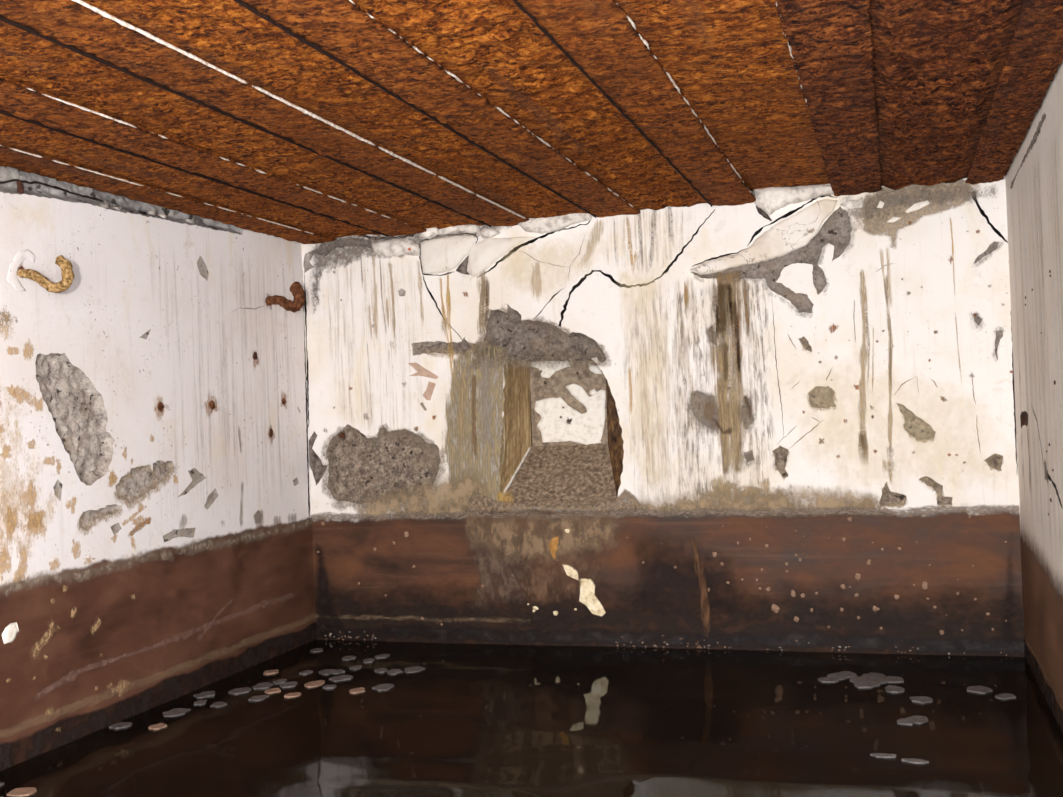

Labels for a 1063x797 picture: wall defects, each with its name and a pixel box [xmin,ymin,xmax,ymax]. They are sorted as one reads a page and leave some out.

spalling [0,166,243,235]
leakage [361,257,395,350]
crack [359,233,478,342]
leakage [584,188,656,265]
crack [477,195,837,327]
flaking render [691,179,972,313]
crack [972,191,1008,243]
flaking render [35,353,115,486]
flaking render [79,460,175,535]
flaking render [309,424,445,512]
flaking render [408,304,608,411]
crack [1010,299,1062,507]